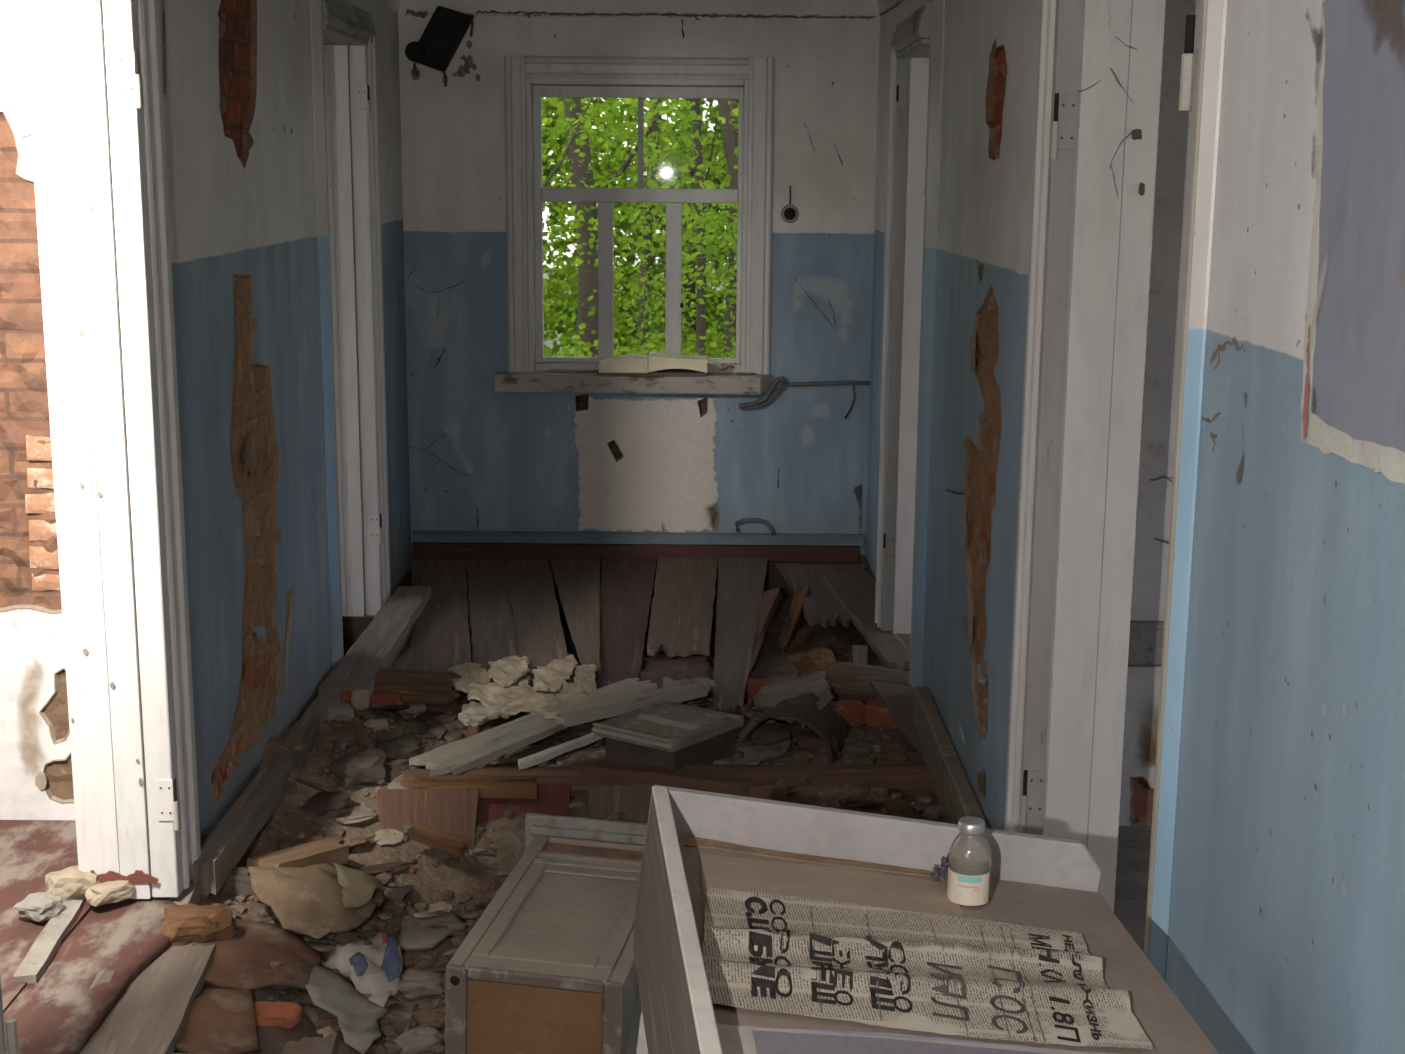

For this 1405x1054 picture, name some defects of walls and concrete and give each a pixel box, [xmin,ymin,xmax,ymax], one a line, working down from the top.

flaking render [218,0,257,168]
crack [467,0,903,39]
flaking render [985,39,1007,160]
flaking render [0,111,62,614]
flaking render [211,274,294,805]
flaking render [574,394,733,533]
flaking render [946,264,1002,742]
flaking render [35,668,74,804]
water stain [1134,668,1161,768]